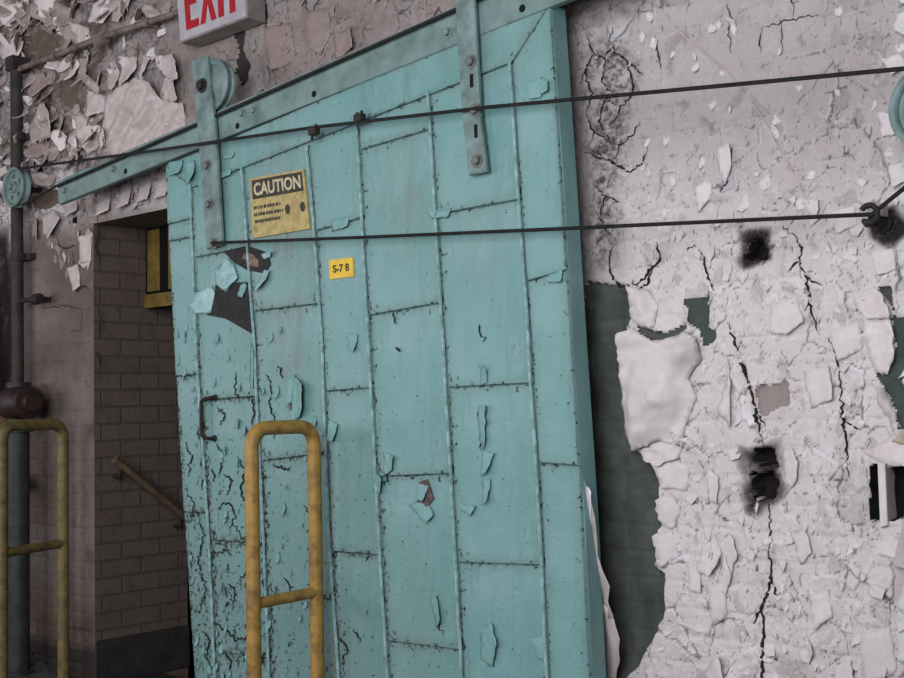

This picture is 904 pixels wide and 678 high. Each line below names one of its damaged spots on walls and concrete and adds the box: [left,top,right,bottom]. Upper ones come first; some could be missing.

peeling [881,0,904,75]
peeling [0,0,203,291]
crack [579,28,661,173]
crack [593,183,661,289]
peeling [695,143,751,212]
peeling [812,206,864,268]
peeling [871,100,904,206]
crack [727,323,766,444]
crack [186,366,293,673]
peeling [584,280,790,678]
crack [338,630,361,665]
crack [753,504,778,678]